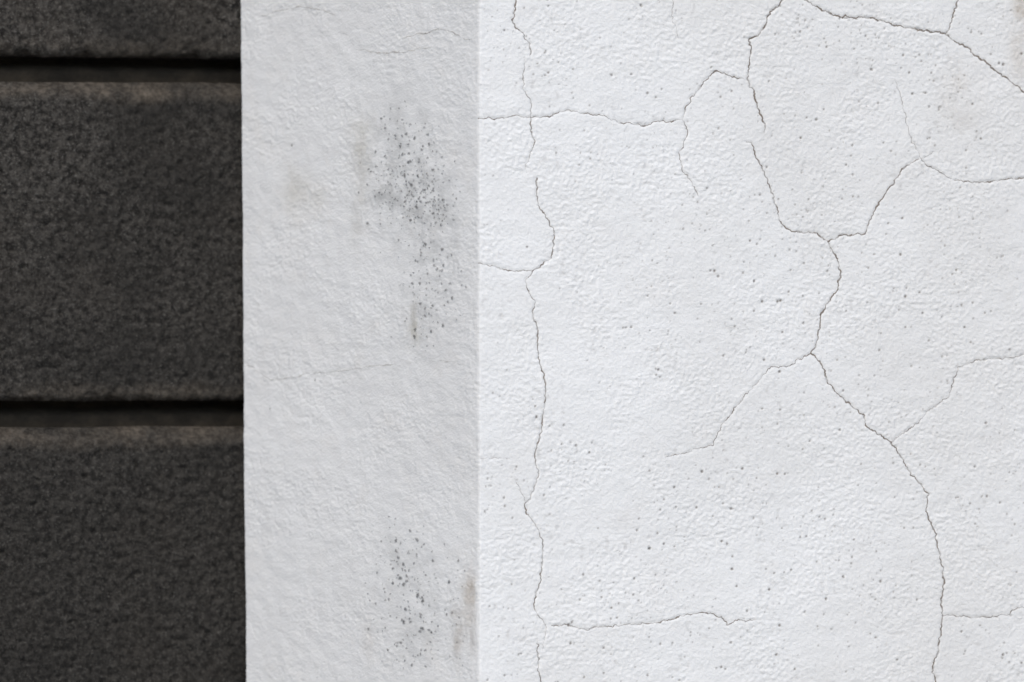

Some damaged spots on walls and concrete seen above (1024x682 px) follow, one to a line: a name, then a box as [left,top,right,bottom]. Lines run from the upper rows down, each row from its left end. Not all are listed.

crack [478,0,559,148]
crack [481,178,555,462]
crack [584,0,1024,682]